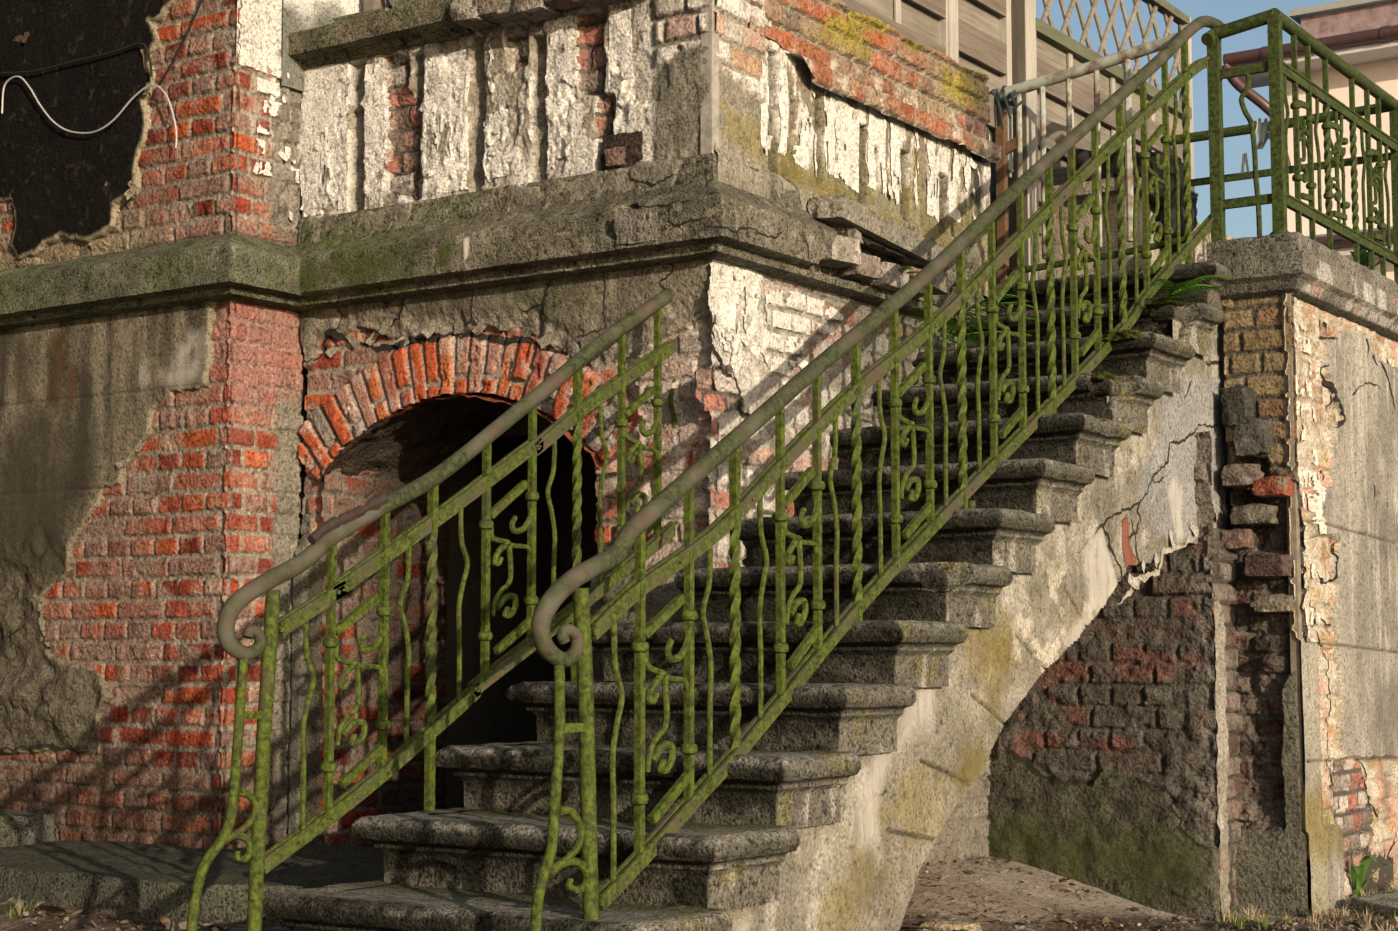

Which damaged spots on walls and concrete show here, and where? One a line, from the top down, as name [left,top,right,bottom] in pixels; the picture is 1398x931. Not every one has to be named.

flaking render [0,0,643,271]
flaking render [749,0,1002,298]
crack [303,308,343,362]
crack [390,299,404,327]
peeling [694,263,844,413]
crack [1071,360,1221,584]
crack [1213,464,1232,516]
flaking render [0,300,237,850]
flaking render [1330,758,1374,873]